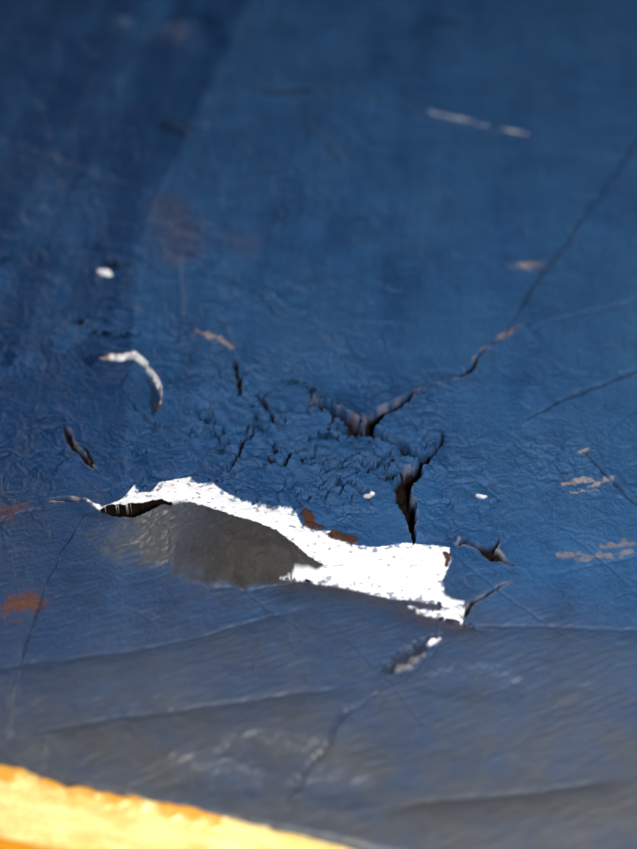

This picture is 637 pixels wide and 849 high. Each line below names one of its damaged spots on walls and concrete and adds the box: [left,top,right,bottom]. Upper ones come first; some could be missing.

crack [225,357,281,476]
crack [304,134,637,545]
crack [4,495,90,743]
peeling [83,477,465,625]
crack [284,534,517,802]